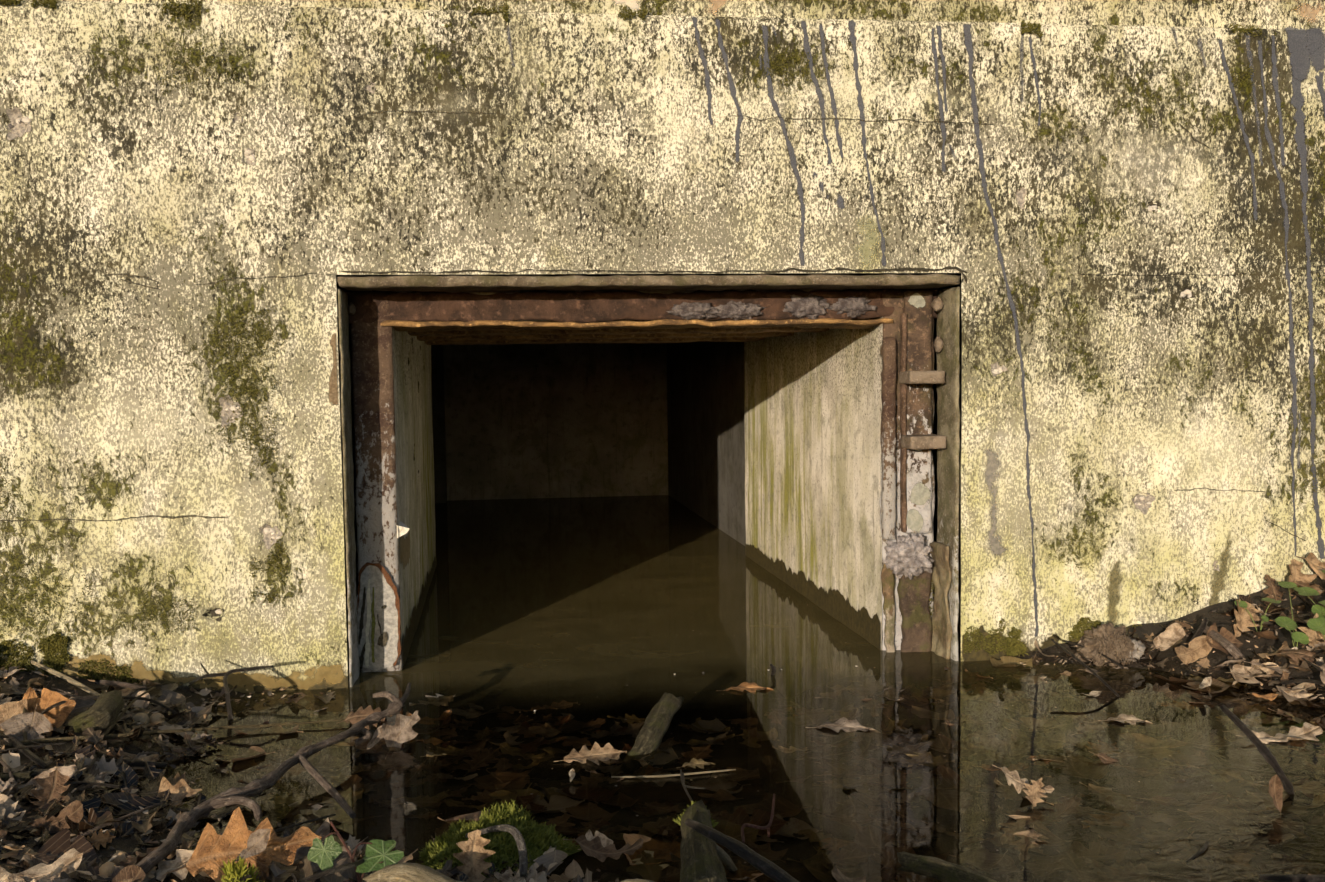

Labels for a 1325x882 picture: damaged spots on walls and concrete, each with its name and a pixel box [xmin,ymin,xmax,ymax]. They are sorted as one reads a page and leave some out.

damp [692,17,743,162]
damp [759,25,805,266]
damp [801,21,843,165]
damp [848,20,886,266]
rust [666,300,767,321]
rust [783,294,878,320]
damp [962,24,1080,661]
damp [1198,27,1325,559]
crack [0,514,227,522]
rust [882,533,935,580]